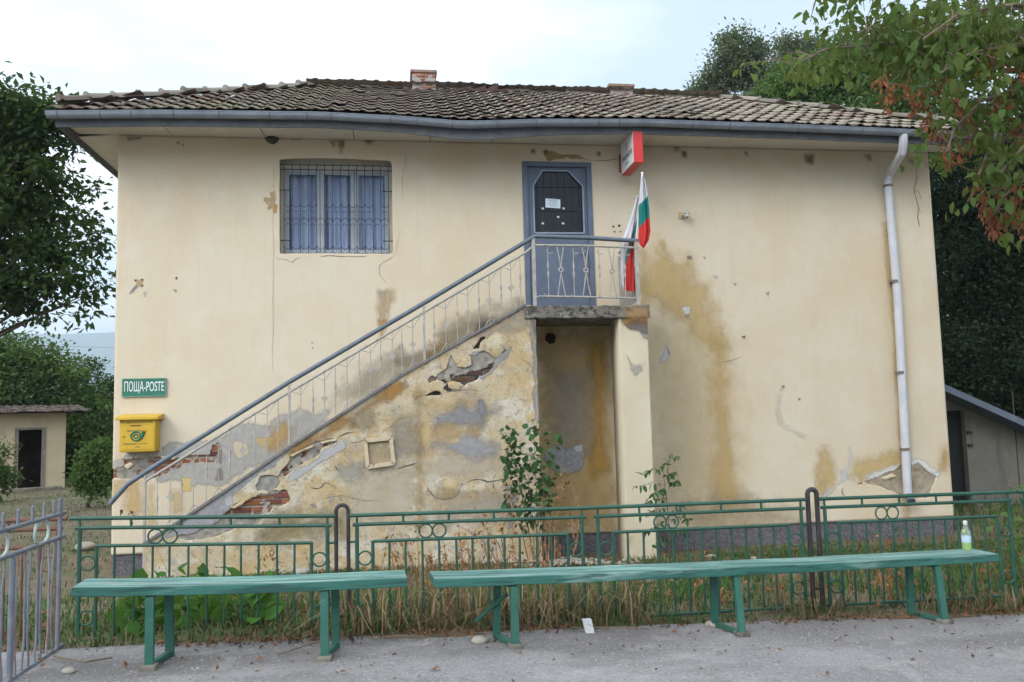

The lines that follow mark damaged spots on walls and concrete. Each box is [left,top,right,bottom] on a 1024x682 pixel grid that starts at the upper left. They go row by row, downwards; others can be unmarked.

spalling [622,317,648,339]
leakage [642,256,725,386]
spalling [428,336,511,391]
leakage [536,326,616,533]
peeling [113,409,346,540]
leakage [817,450,940,503]
spalling [858,463,936,499]